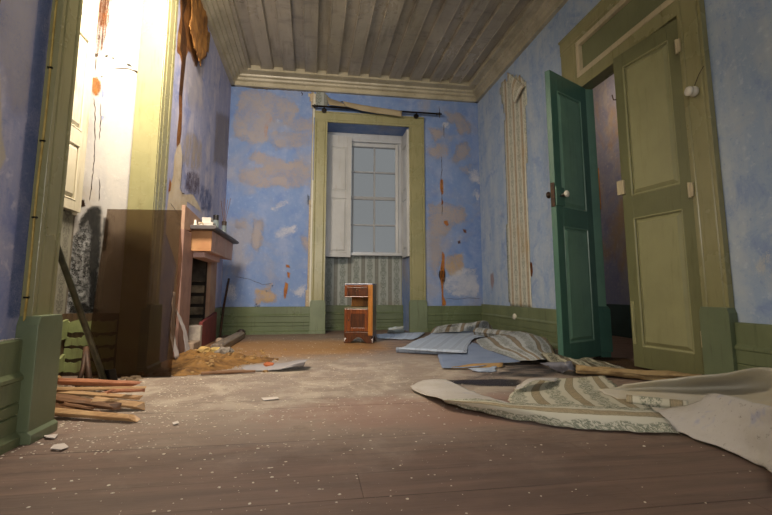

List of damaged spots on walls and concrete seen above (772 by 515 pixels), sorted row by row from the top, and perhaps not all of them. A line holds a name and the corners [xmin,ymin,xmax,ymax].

rust [95,0,112,58]
rust [92,77,101,96]
crack [89,100,101,201]
spalling [166,0,210,303]
water stain [67,206,109,313]
peeling [443,252,479,298]